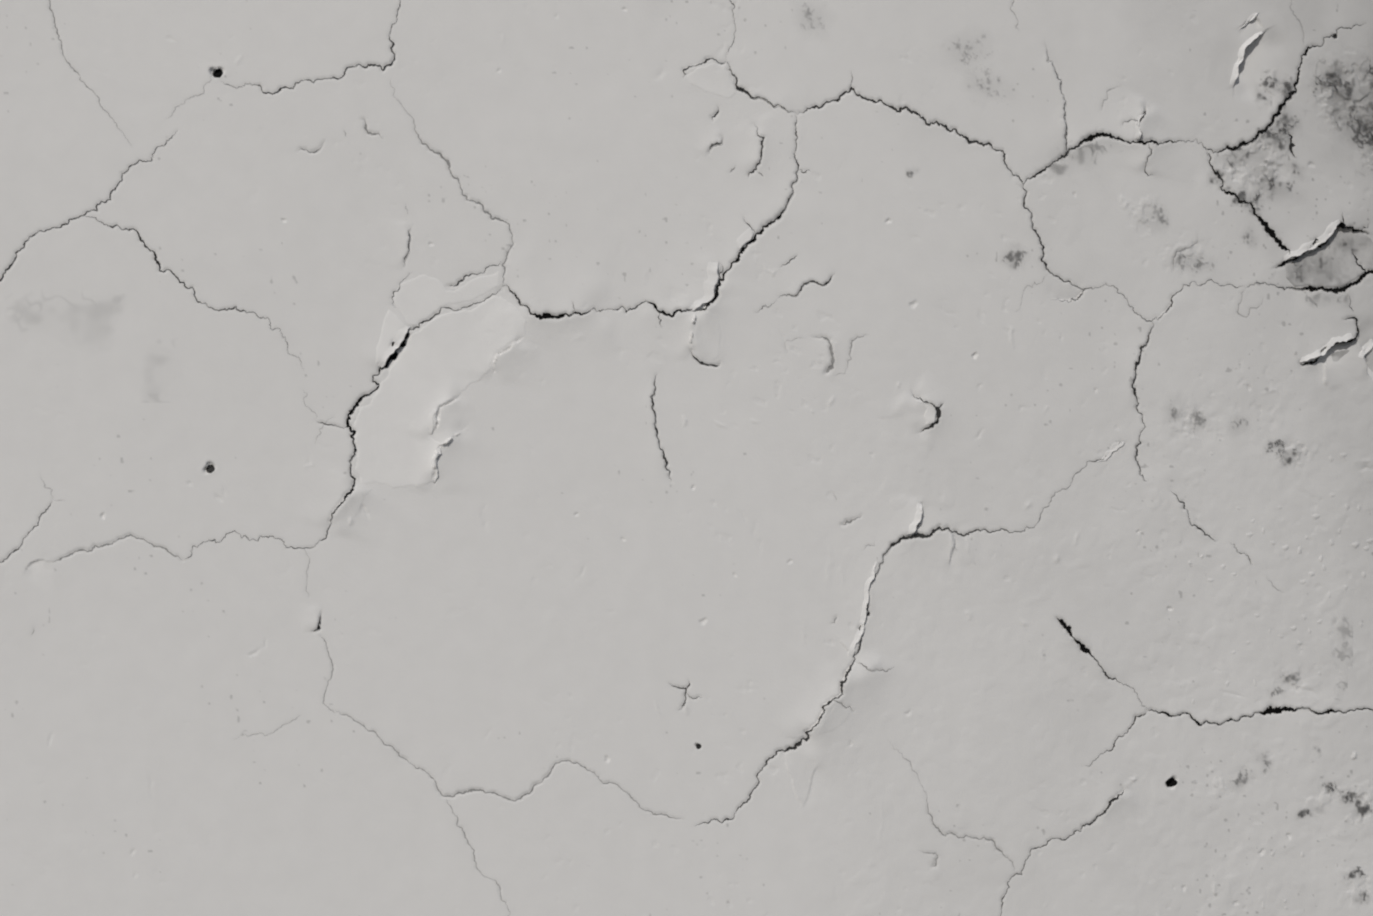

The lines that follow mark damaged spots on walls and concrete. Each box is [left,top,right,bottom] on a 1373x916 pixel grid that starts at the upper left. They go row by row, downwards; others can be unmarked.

peeling [1230,13,1264,87]
spalling [347,271,526,518]
crack [0,0,1373,593]
spalling [1283,219,1373,289]
peeling [1300,333,1373,372]
crack [314,605,894,912]
crack [898,751,1124,913]
crack [1056,616,1373,766]